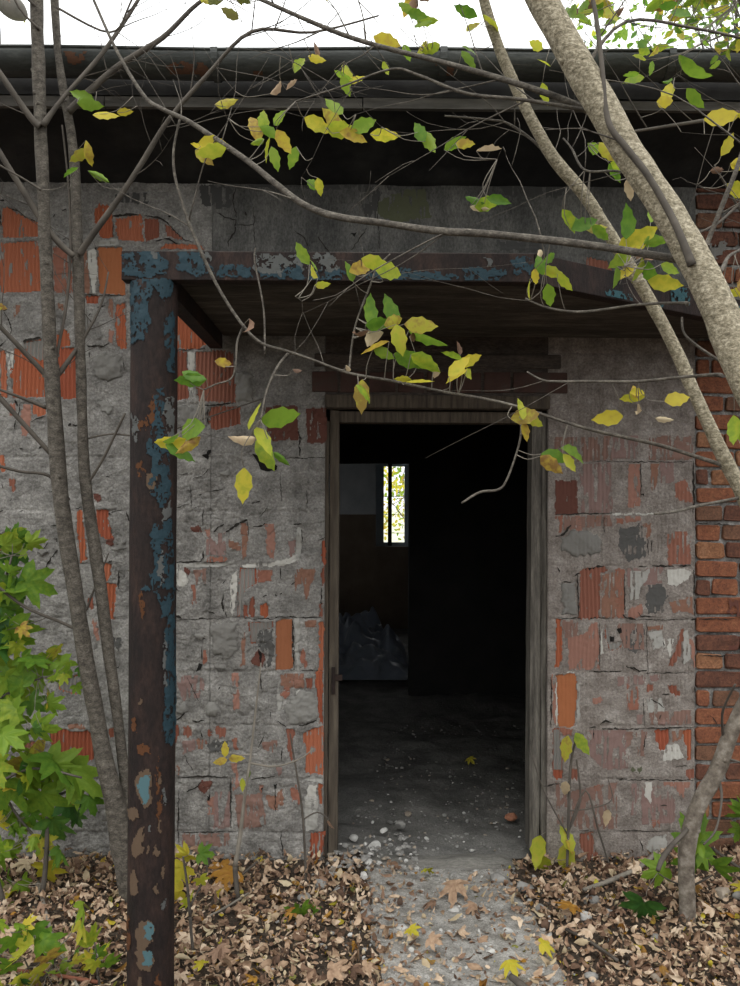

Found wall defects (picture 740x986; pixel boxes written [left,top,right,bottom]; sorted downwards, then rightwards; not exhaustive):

spalling [0,207,41,293]
peeling [85,203,347,349]
peeling [363,256,534,280]
spalling [0,339,46,417]
spalling [56,329,76,399]
spalling [130,311,241,746]
spalling [103,562,117,619]
spalling [238,567,294,670]
spalling [577,567,622,651]
spalling [669,628,684,666]
peeling [127,769,167,910]
peeling [134,920,155,986]